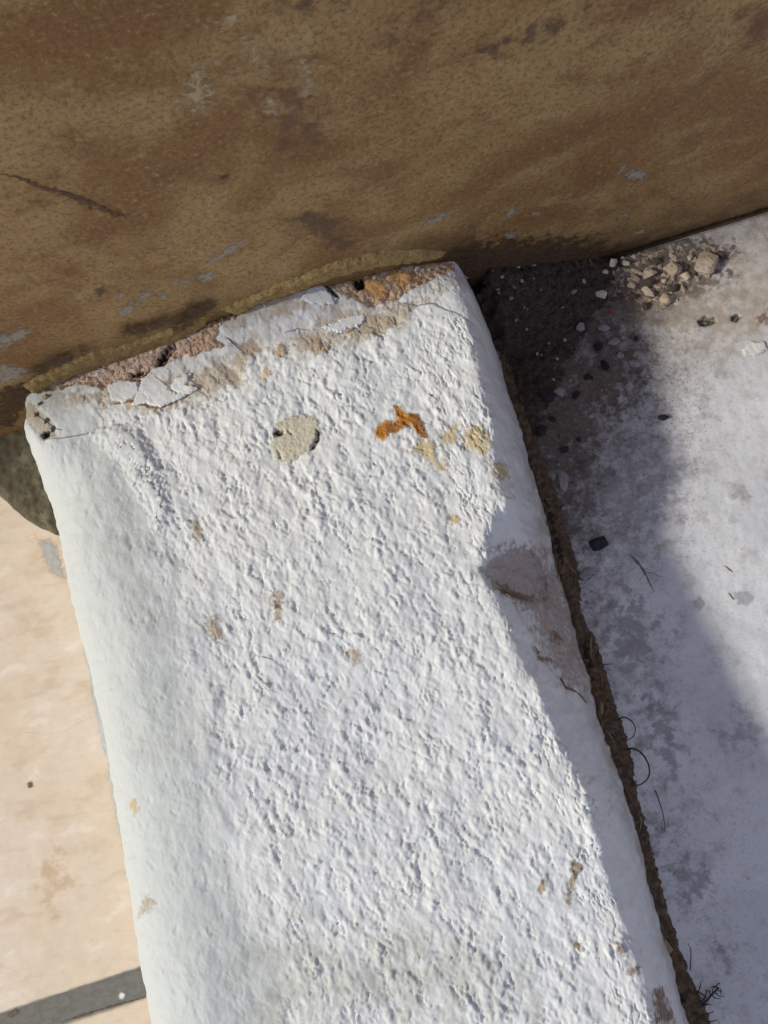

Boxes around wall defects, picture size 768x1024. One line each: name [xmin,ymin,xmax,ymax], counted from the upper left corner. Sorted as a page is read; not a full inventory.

crack [0,174,126,218]
flaking render [26,314,240,441]
damp [121,302,217,338]
flaking render [240,342,287,359]
flaking render [299,262,457,356]
rust [375,405,509,481]